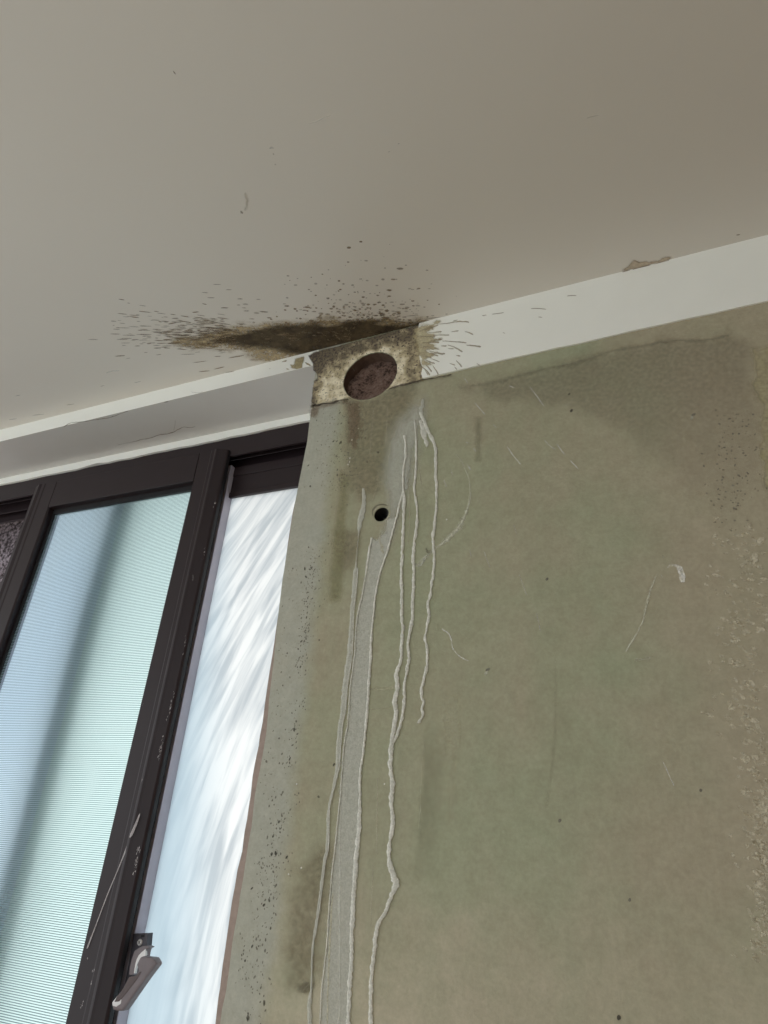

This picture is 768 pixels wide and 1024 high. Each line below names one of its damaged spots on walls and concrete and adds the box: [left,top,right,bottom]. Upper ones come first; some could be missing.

peeling [623,257,670,272]
water stain [113,268,481,375]
water stain [302,399,438,1024]